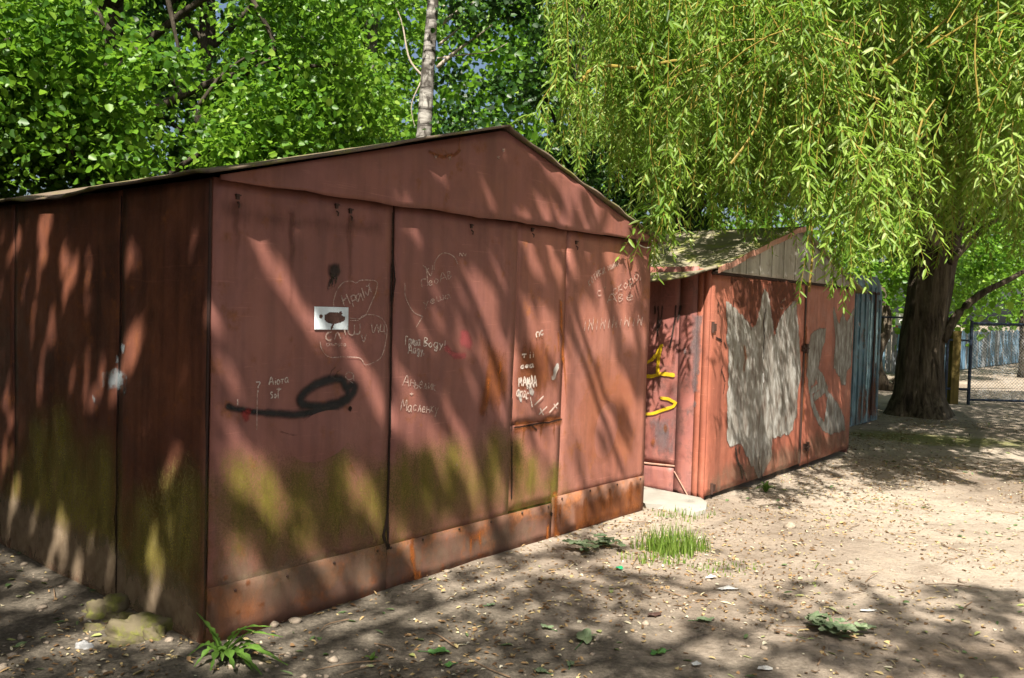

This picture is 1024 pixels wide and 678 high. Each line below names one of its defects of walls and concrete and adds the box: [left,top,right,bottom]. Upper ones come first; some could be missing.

peeling [731,276,796,359]
corrosion [576,483,641,527]